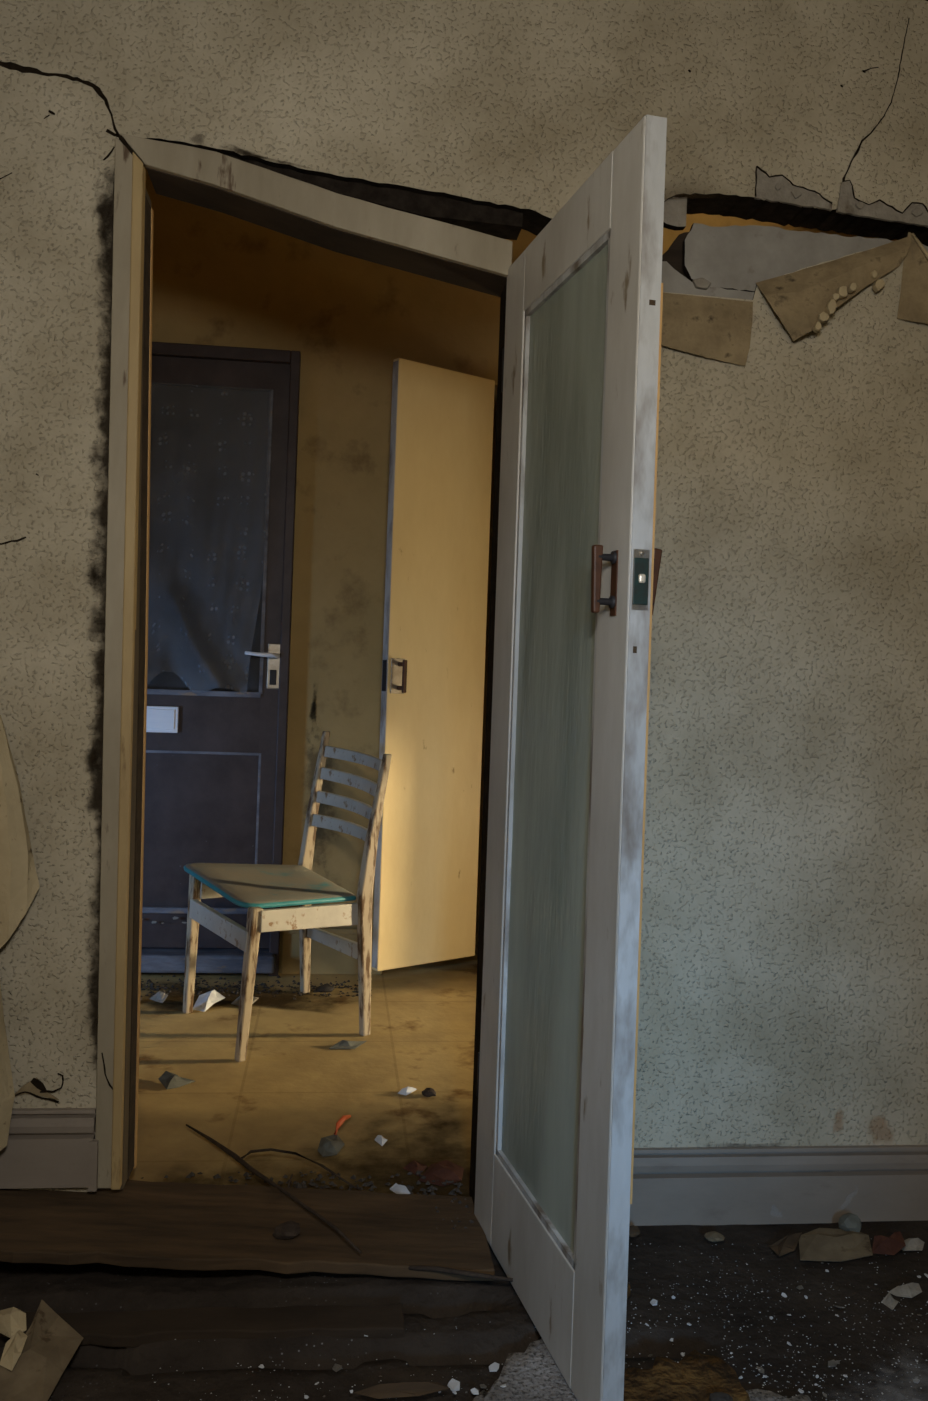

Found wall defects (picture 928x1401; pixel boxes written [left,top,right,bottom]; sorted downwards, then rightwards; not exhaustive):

crack [0,61,145,192]
crack [842,0,928,181]
spalling [663,197,687,231]
spalling [754,166,928,228]
leakage [87,176,114,1061]